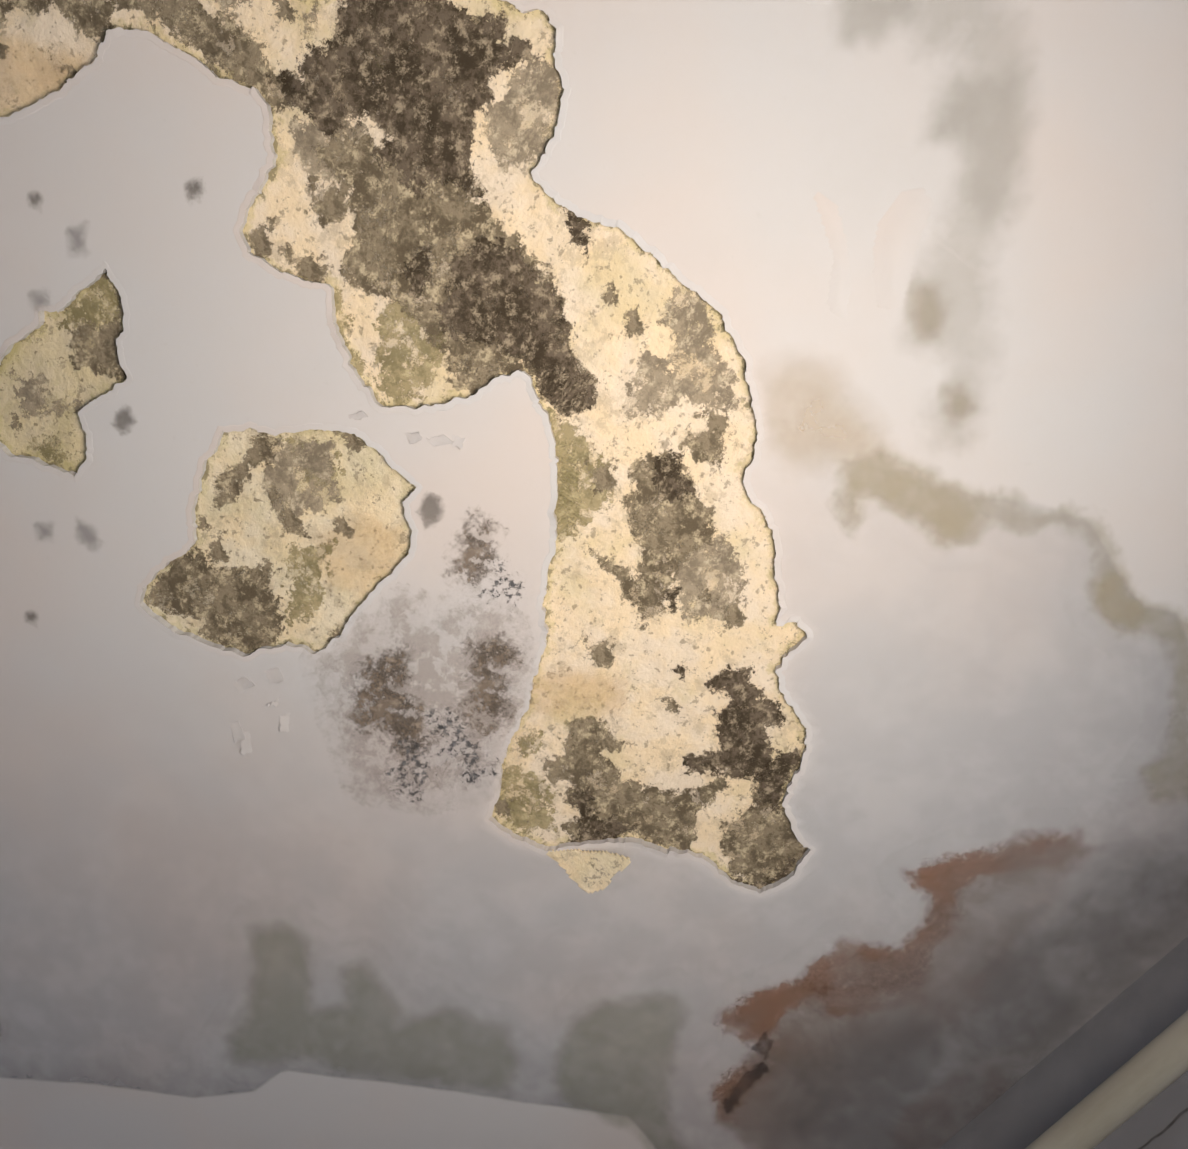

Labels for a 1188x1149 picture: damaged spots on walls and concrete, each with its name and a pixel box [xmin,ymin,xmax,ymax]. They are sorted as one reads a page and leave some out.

peeling [0,0,817,898]
leakage [422,495,439,523]
leakage [454,515,523,606]
leakage [352,635,522,803]
rust [719,960,842,1114]